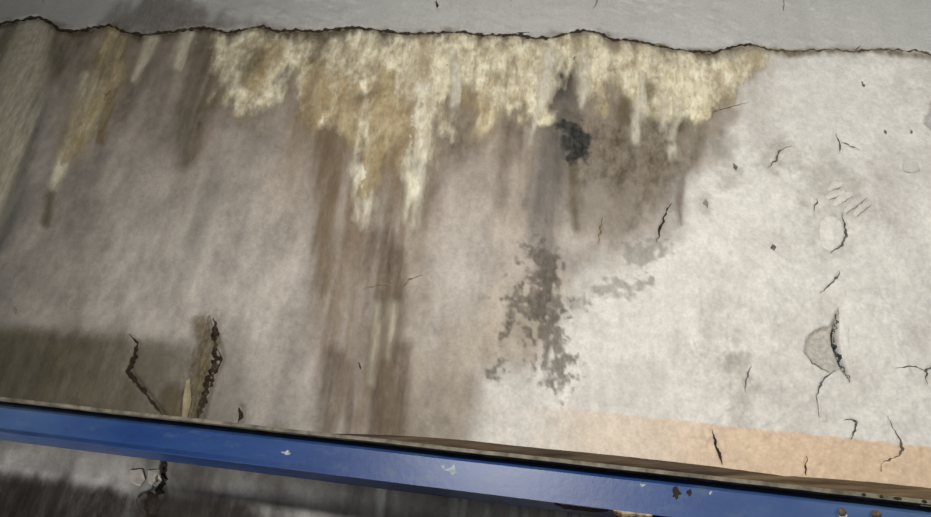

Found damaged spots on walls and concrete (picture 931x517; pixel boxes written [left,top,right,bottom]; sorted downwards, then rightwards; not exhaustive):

leakage [0,19,62,240]
leakage [44,0,202,225]
leakage [185,29,769,226]
crack [656,203,672,241]
leakage [500,239,577,387]
leakage [0,333,138,412]
crack [125,334,162,415]
crack [898,365,931,384]
crack [712,430,723,465]
crack [883,418,904,462]